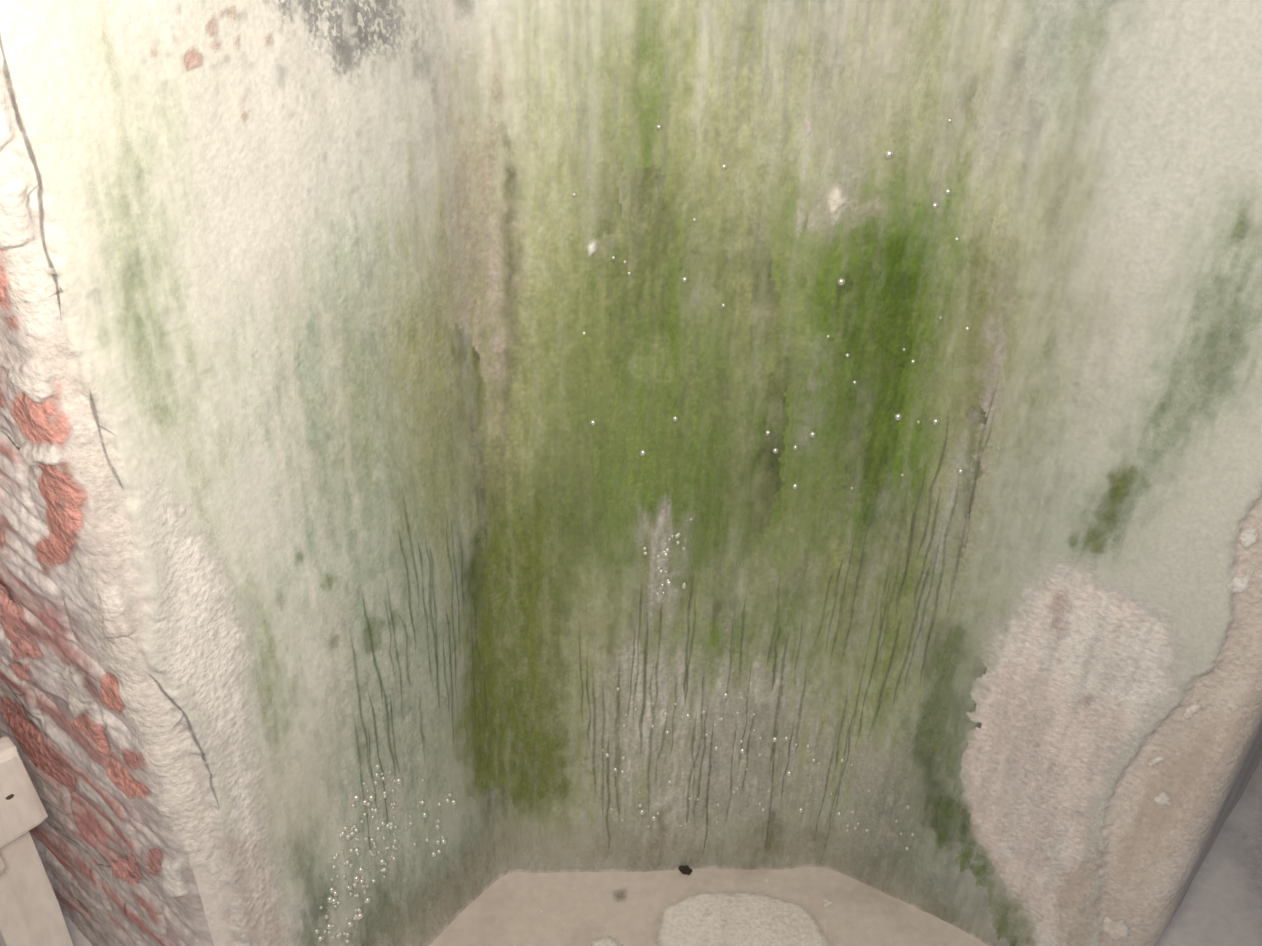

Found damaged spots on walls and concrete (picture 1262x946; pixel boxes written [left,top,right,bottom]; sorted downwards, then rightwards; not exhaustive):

peeling [206,8,235,48]
peeling [184,49,203,70]
damp [1233,218,1247,240]
spalling [0,81,289,946]
damp [264,0,1016,946]
damp [1103,470,1134,520]
peeling [960,496,1262,946]